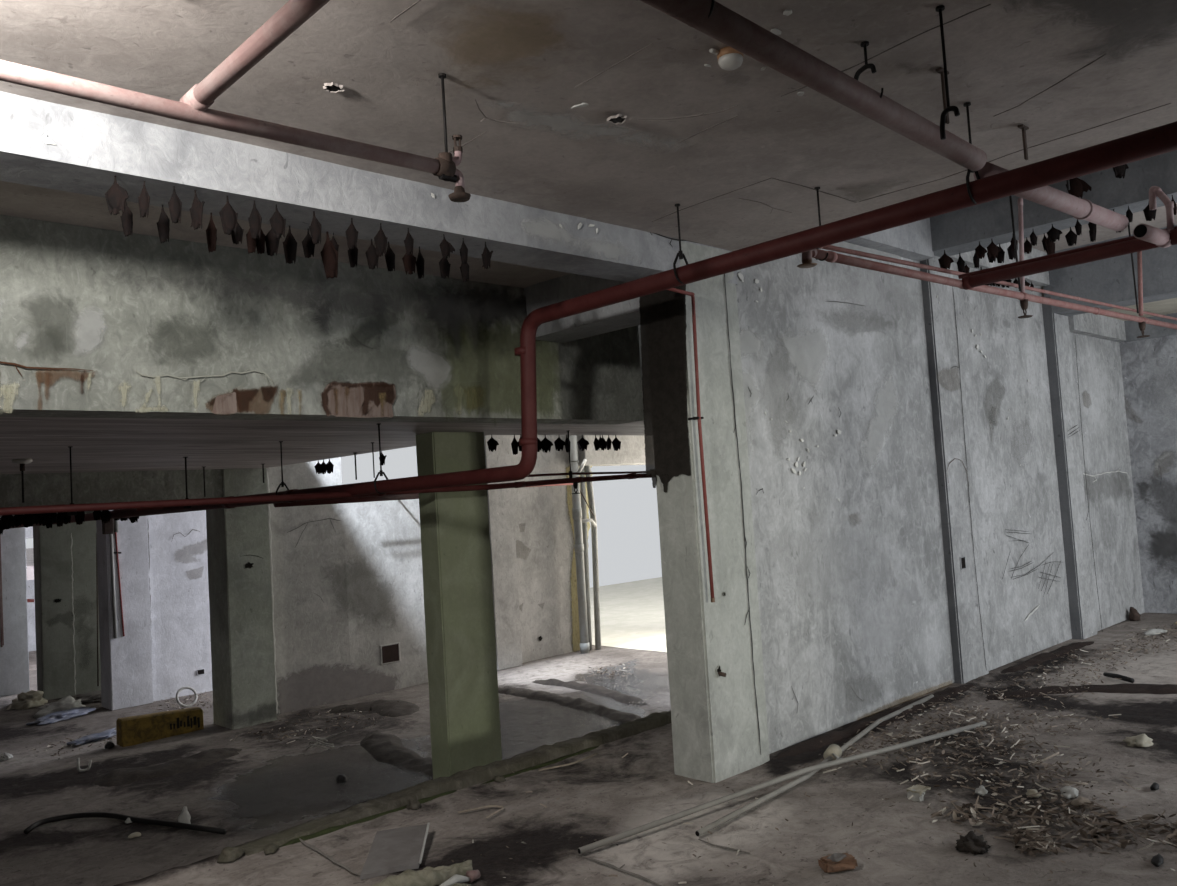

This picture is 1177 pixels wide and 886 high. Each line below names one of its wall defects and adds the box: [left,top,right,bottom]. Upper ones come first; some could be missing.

spalling [321,381,396,418]